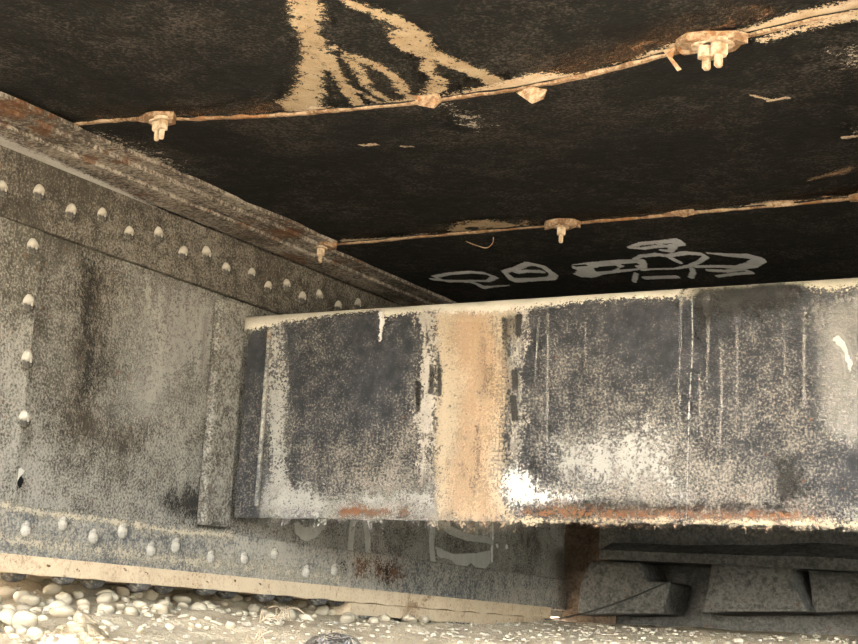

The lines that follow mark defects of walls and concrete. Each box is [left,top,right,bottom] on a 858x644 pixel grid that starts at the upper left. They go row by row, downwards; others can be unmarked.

damp [243,278,858,530]
corrosion [427,306,858,536]